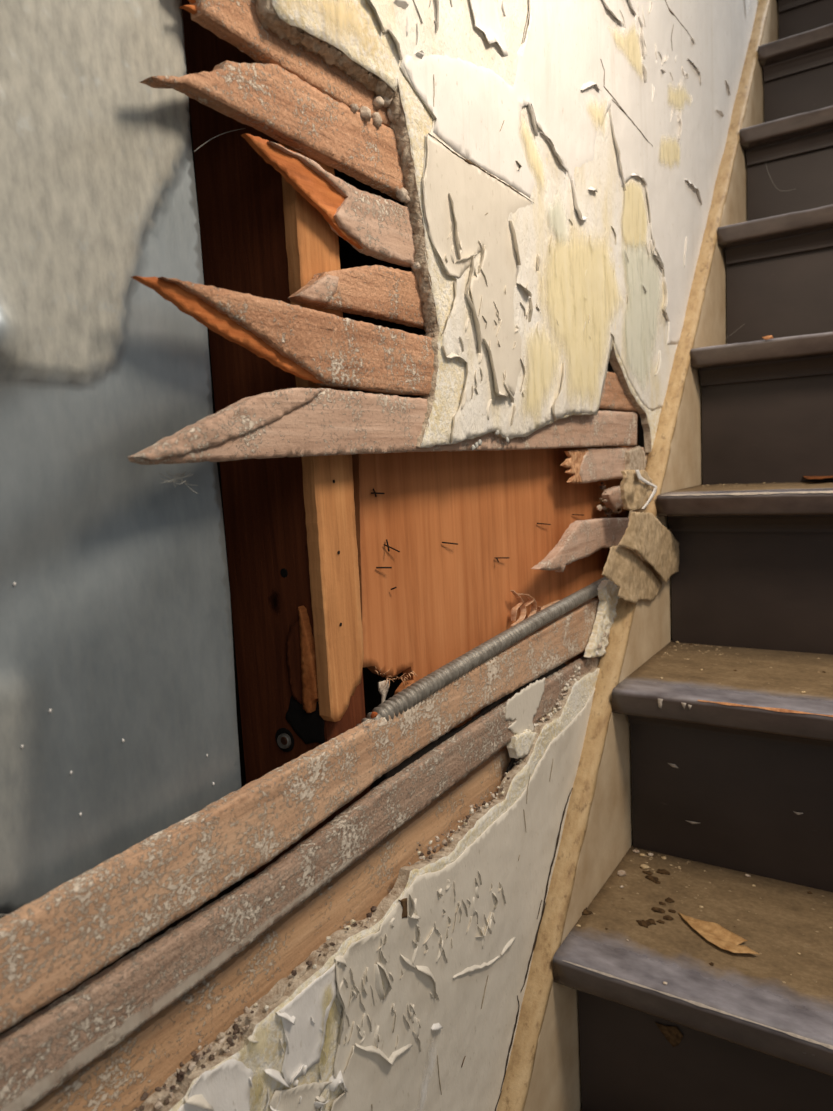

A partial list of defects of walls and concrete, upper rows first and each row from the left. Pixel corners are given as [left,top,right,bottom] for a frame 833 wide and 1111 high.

peeling [255,0,759,447]
flaking render [597,482,622,518]
flaking render [625,446,647,470]
peeling [132,579,620,1111]